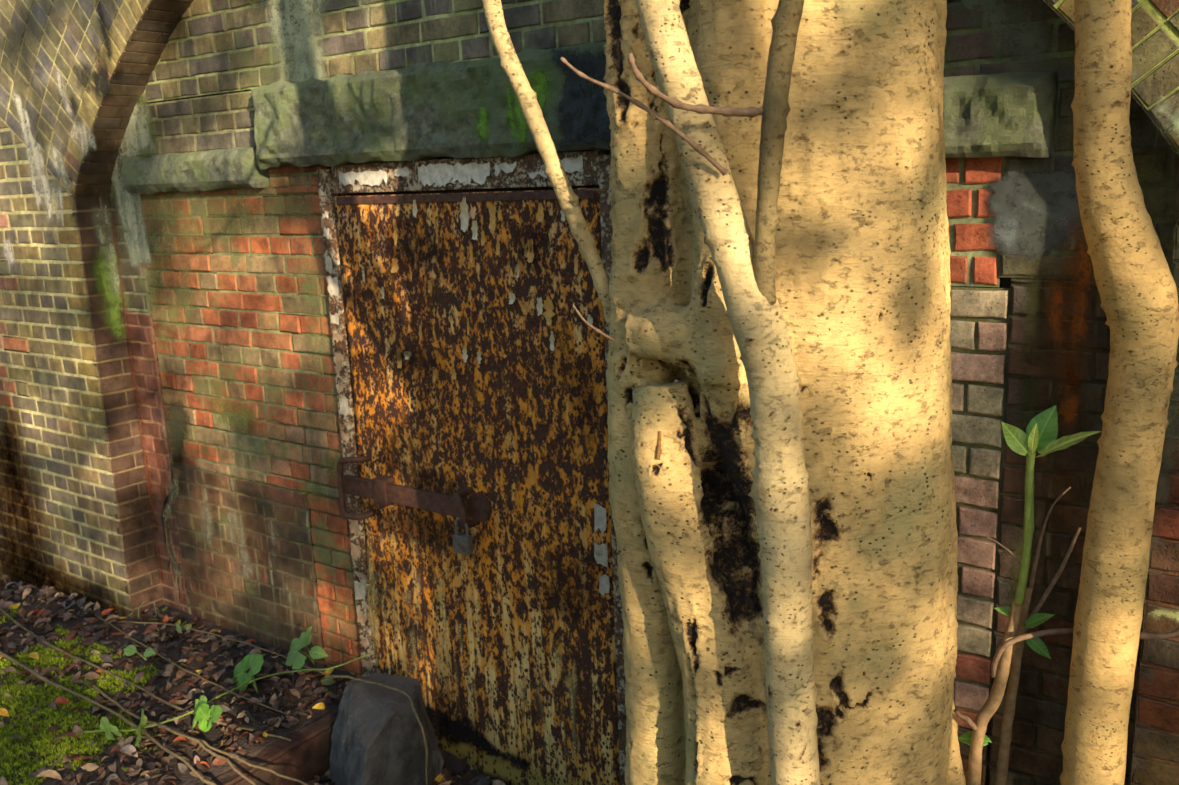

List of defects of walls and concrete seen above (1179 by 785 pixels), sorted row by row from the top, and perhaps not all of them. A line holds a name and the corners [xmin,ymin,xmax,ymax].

damp [287,47,324,83]
damp [56,69,96,150]
damp [13,93,68,219]
peeling [560,156,583,173]
peeling [391,219,399,273]
corrosion [361,219,442,262]
peeling [339,161,547,264]
peeling [451,318,482,380]
peeling [508,293,555,351]
corrosion [1048,240,1094,424]
damp [0,422,125,616]
corrosion [425,706,528,770]